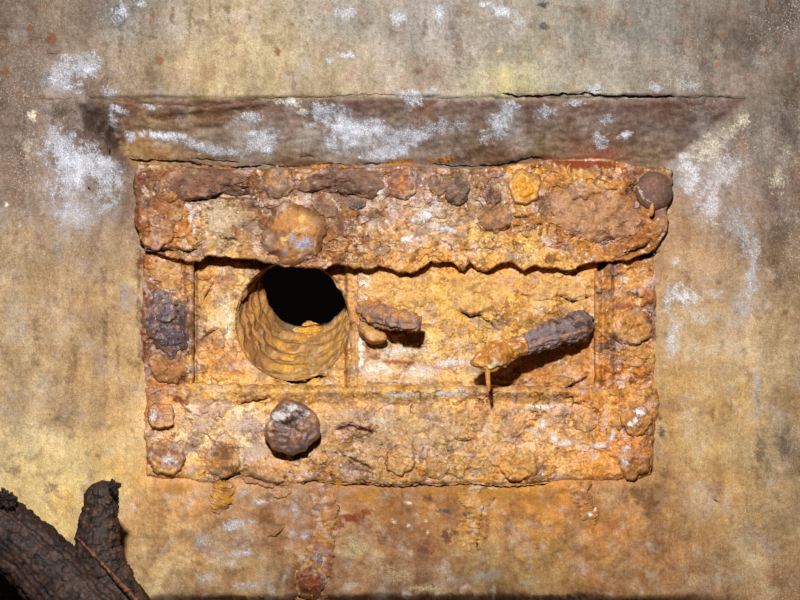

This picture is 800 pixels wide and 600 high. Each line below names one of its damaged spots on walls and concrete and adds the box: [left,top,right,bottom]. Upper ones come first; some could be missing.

damp [279,98,459,161]
damp [480,101,521,141]
crack [503,90,745,109]
damp [26,86,278,250]
corrosion [291,160,411,232]
damp [677,114,760,323]
corrosion [137,252,191,384]
corrosion [293,321,324,338]
corrosion [359,267,433,309]
corrosion [450,265,587,316]
damp [662,282,728,362]
corrosion [472,336,529,392]